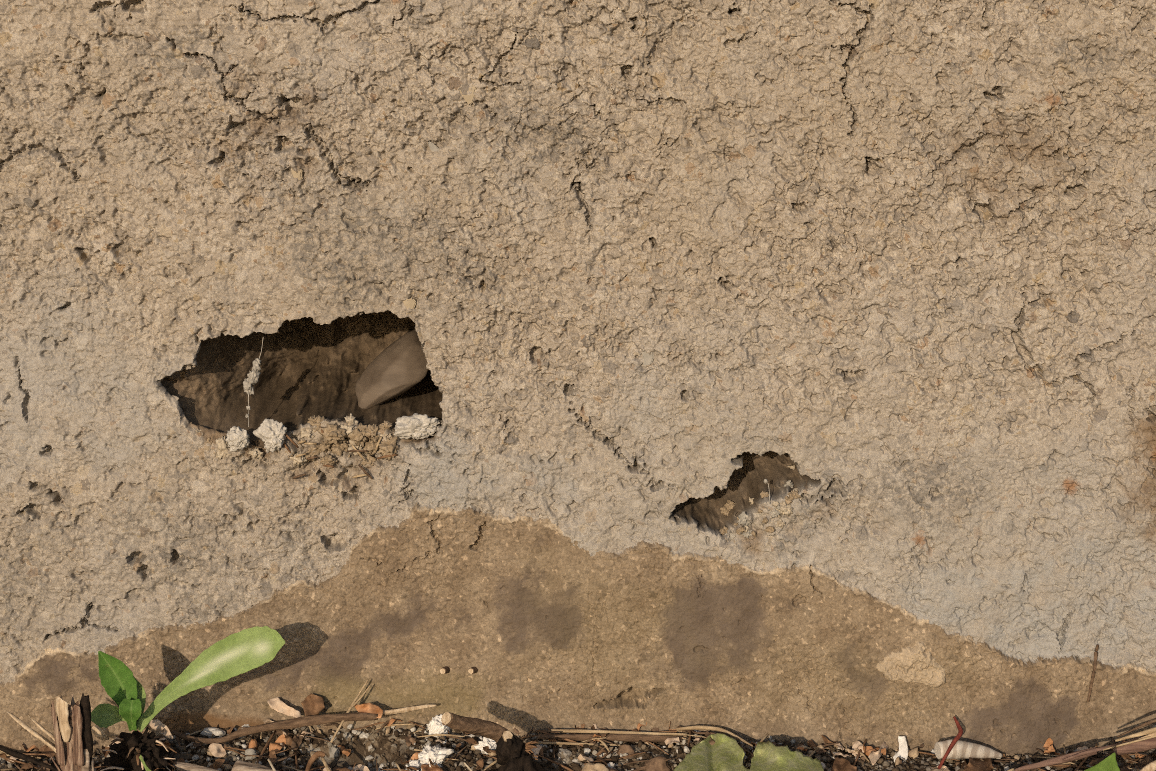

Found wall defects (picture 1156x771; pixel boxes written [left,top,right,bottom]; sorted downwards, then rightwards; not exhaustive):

crack [182,51,372,192]
spalling [156,298,443,487]
spalling [1143,405,1156,522]
spalling [0,451,1156,688]
hole [593,686,665,710]